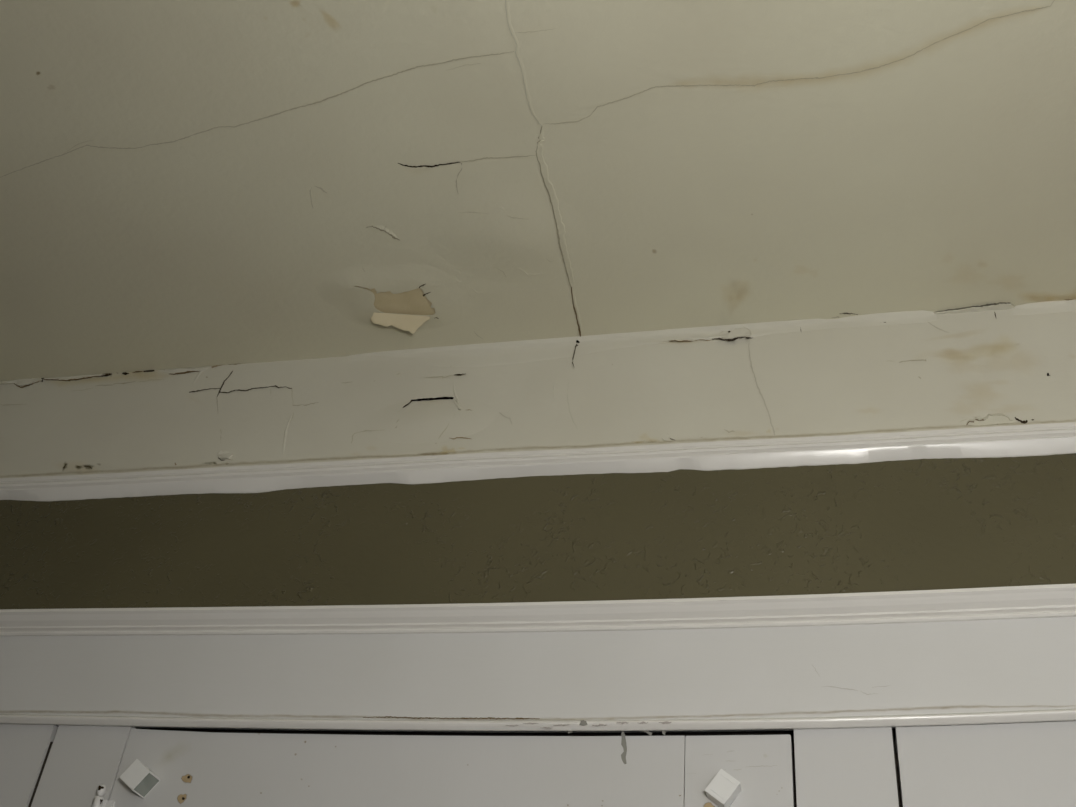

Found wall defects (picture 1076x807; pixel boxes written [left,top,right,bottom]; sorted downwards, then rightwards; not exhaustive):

crack [2,0,1055,366]
crack [0,364,319,456]
crack [669,327,775,435]